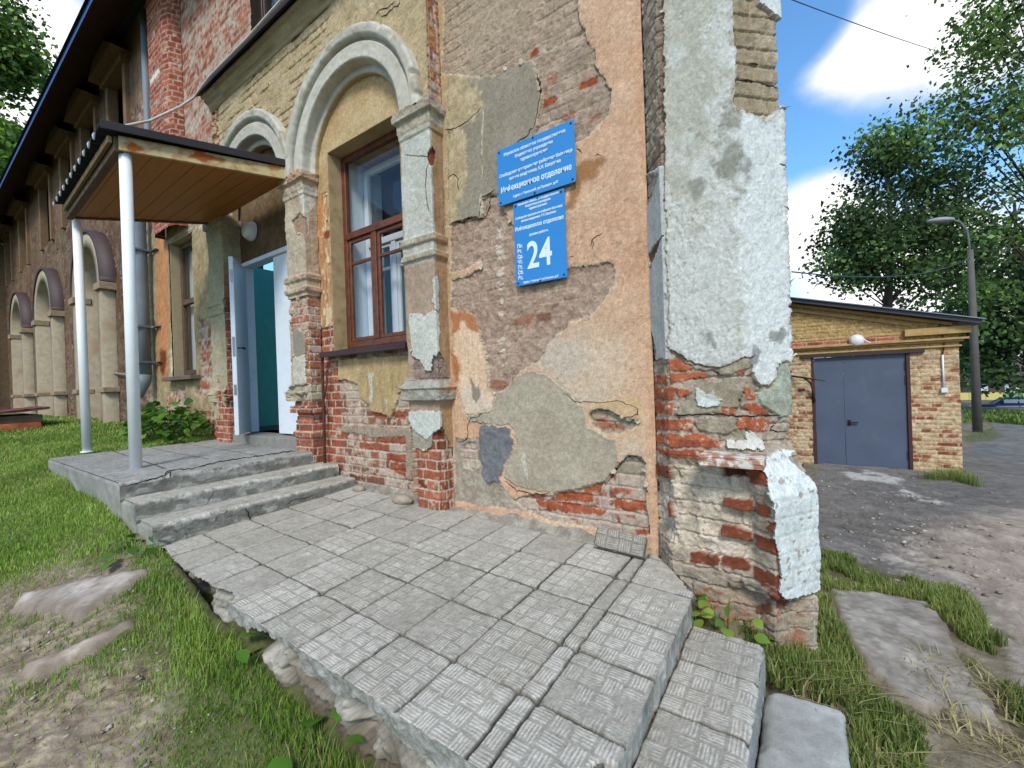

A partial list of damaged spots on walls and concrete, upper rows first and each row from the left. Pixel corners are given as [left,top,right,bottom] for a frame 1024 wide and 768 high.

flaking render [425,0,612,143]
flaking render [732,0,791,116]
flaking render [288,191,616,511]
crack [125,450,294,487]
flaking render [513,347,820,654]